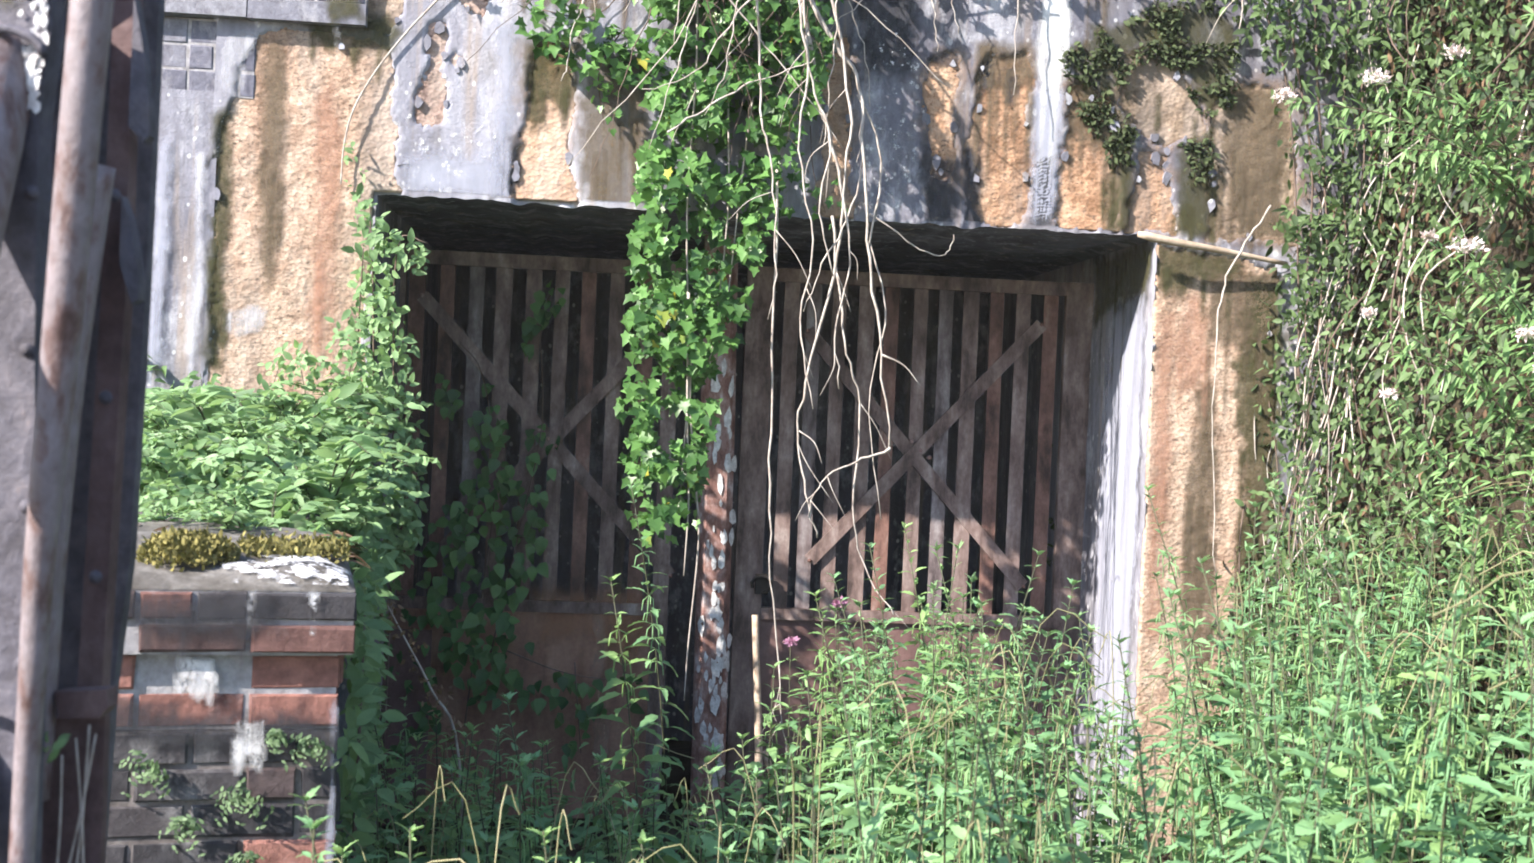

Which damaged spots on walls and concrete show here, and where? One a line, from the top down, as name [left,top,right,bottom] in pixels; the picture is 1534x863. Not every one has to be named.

peeling [18,0,50,114]
damp [189,108,262,368]
damp [258,45,285,278]
spalling [207,27,403,404]
spalling [415,21,465,127]
spalling [510,69,579,202]
spalling [921,52,1036,228]
damp [974,0,1128,220]
spalling [1053,48,1304,859]
peeling [694,358,737,790]
damp [176,672,213,700]
damp [234,742,261,767]